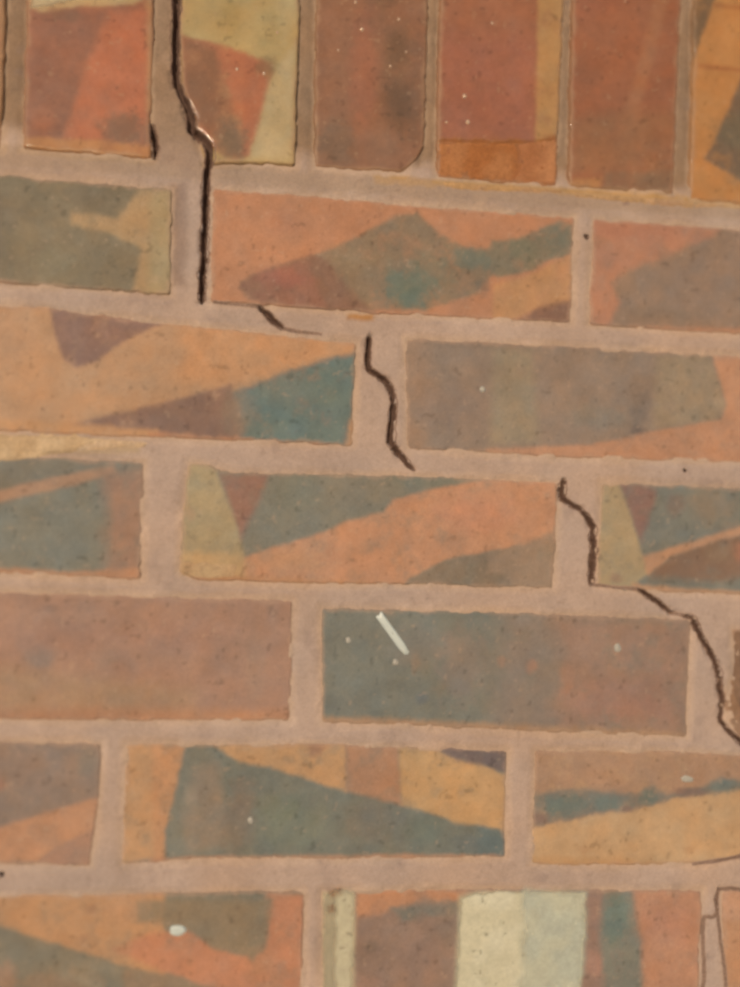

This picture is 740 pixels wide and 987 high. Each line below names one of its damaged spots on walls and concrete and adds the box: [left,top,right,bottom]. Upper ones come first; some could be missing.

crack [148,124,161,159]
crack [168,0,322,336]
crack [363,336,416,472]
crack [557,479,740,745]